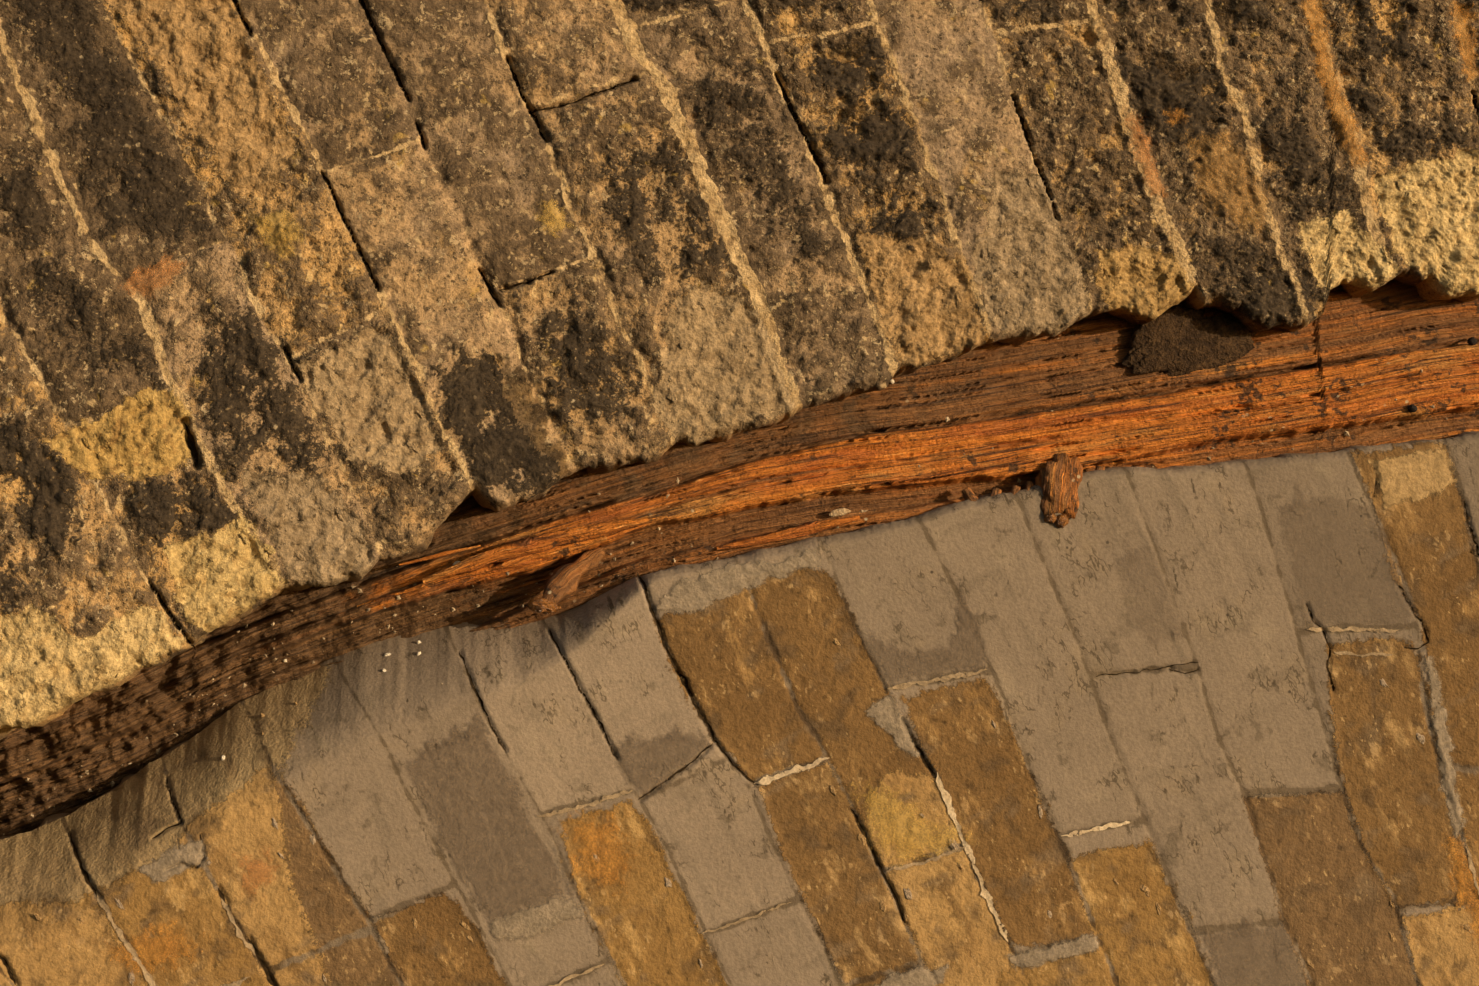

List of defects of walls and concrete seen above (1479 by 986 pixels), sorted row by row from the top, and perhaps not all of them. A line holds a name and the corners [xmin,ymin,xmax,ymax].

water stain [0,126,166,398]
water stain [0,0,222,252]
water stain [129,297,348,549]
water stain [430,342,560,508]
crack [478,270,551,305]
crack [507,59,635,142]
water stain [515,284,645,433]
water stain [596,119,733,296]
water stain [807,38,958,253]
water stain [0,417,104,617]
crack [1307,605,1335,691]
crack [1399,586,1429,649]